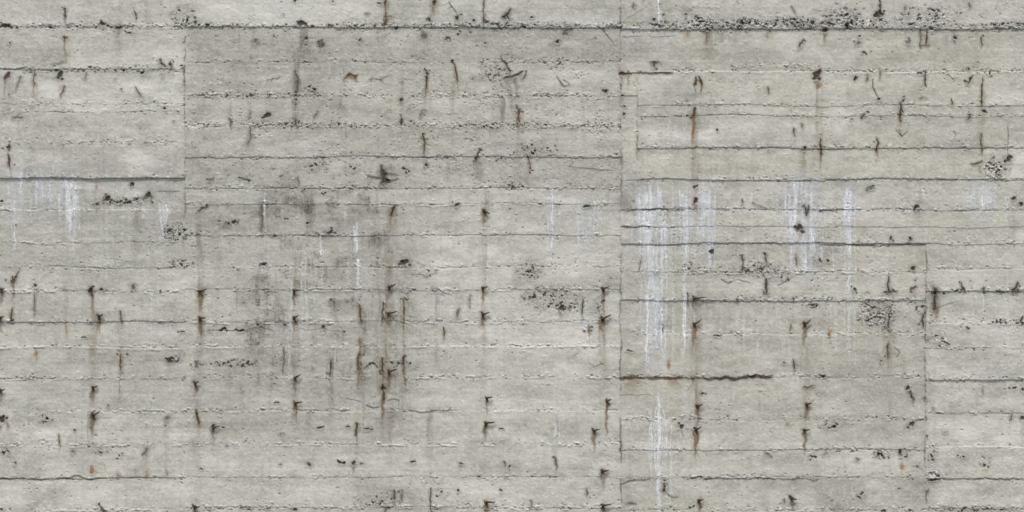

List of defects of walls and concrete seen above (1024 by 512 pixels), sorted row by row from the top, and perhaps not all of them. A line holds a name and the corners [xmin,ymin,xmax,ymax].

efflorescence [636,184,716,371]
efflorescence [783,175,823,270]
efflorescence [834,187,856,337]
efflorescence [649,393,693,506]